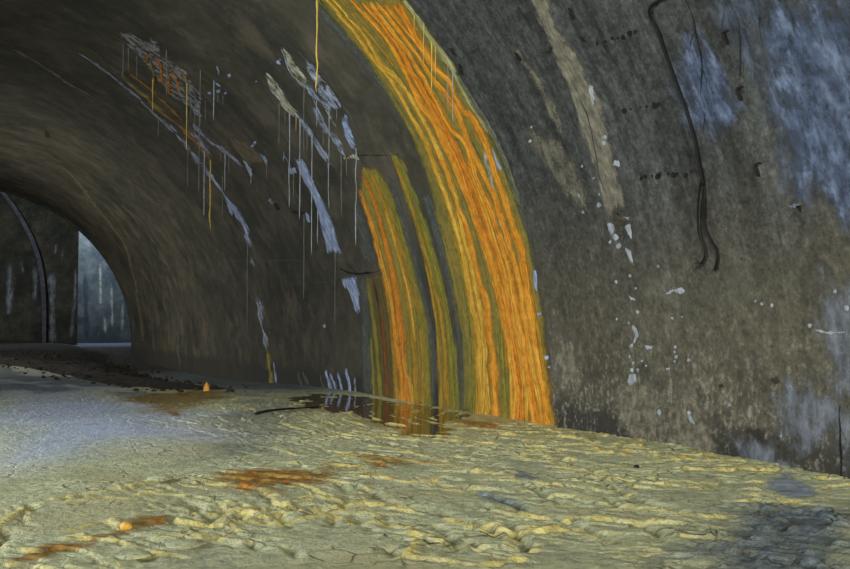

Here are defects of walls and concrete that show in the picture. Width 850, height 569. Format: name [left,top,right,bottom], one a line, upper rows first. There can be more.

corrosion [145,50,188,95]
water stain [67,30,277,383]
water stain [266,48,375,272]
corrosion [318,0,555,428]
water stain [516,49,586,206]
crack [685,1,713,133]
water stain [680,41,740,128]
water stain [765,0,850,218]